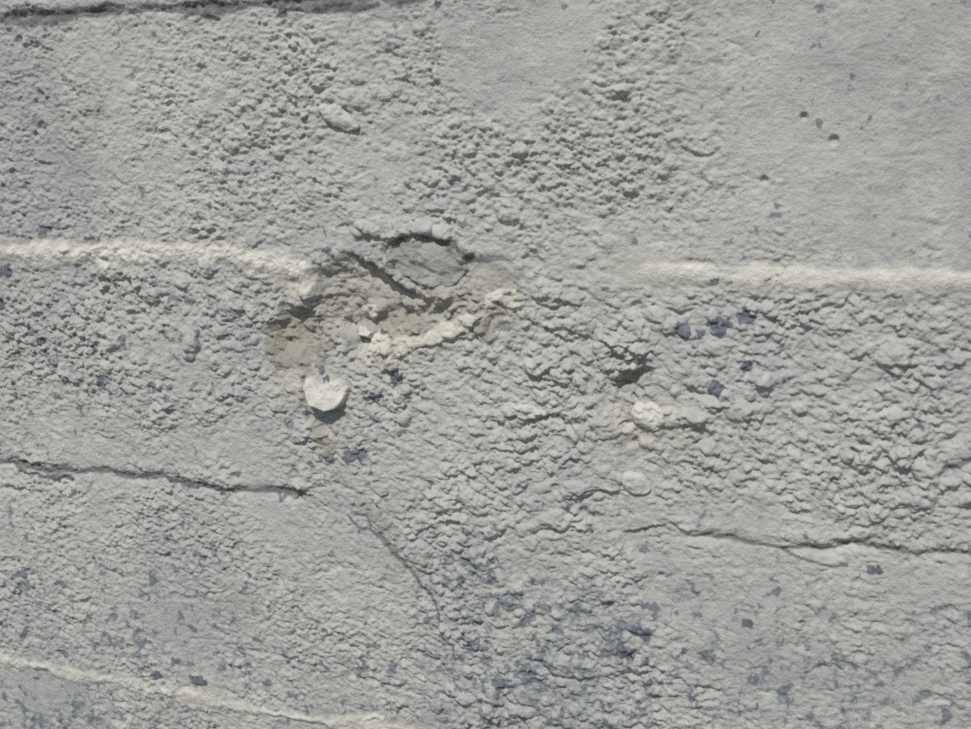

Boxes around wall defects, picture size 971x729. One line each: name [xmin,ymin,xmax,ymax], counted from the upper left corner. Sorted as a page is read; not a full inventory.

crack [0,0,425,26]
spalling [263,235,519,367]
crack [0,459,322,497]
crack [692,533,971,567]